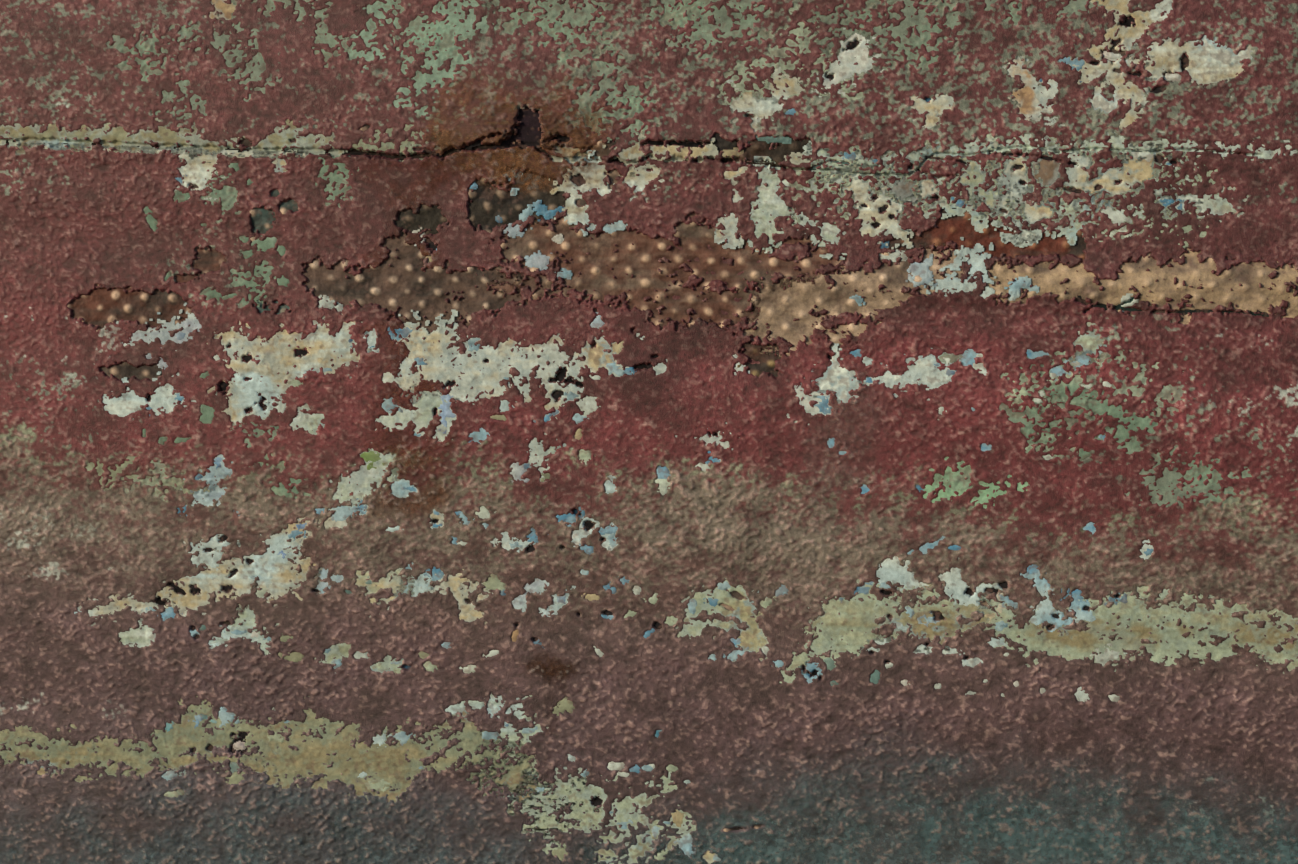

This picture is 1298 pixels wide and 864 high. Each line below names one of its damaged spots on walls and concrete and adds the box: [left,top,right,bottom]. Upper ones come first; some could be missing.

crack [281,127,569,161]
crack [612,140,849,171]
crack [916,150,1057,178]
spalling [0,0,1298,675]
peeling [1074,687,1090,702]
peeling [0,692,721,864]